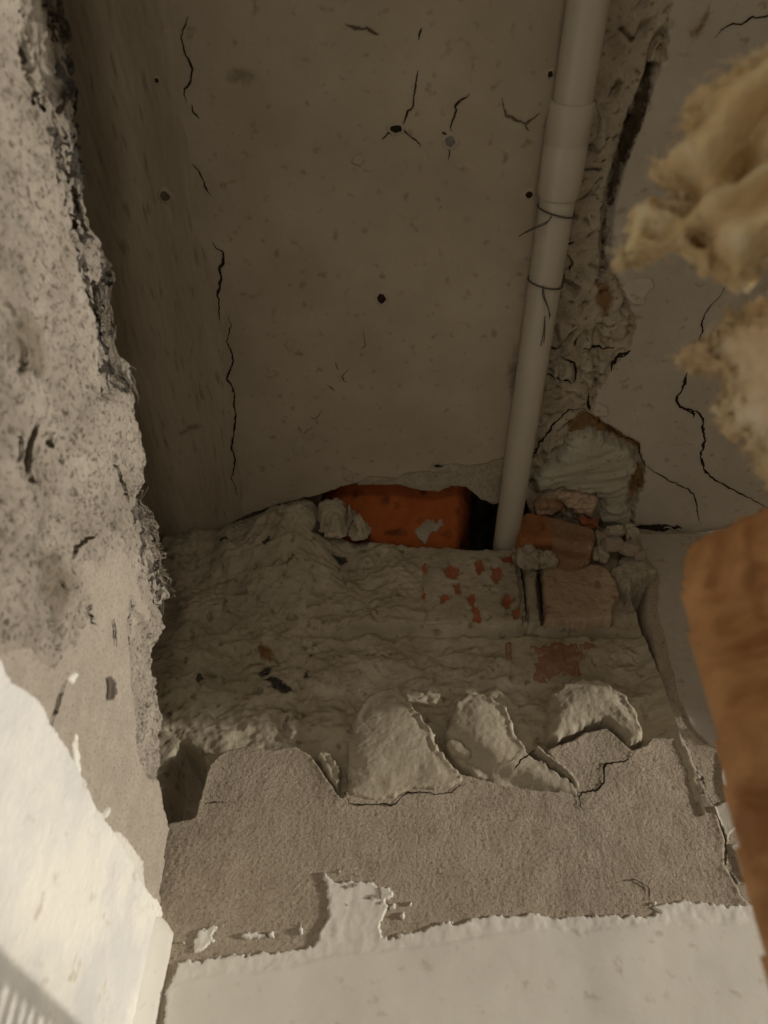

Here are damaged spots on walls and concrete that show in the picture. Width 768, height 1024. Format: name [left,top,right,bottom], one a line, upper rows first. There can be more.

crack [180,16,199,118]
crack [382,71,469,160]
crack [213,243,237,493]
crack [533,337,767,518]
crack [699,287,725,339]
spalling [127,497,743,884]
crack [578,751,636,810]
peeling [164,870,768,1024]